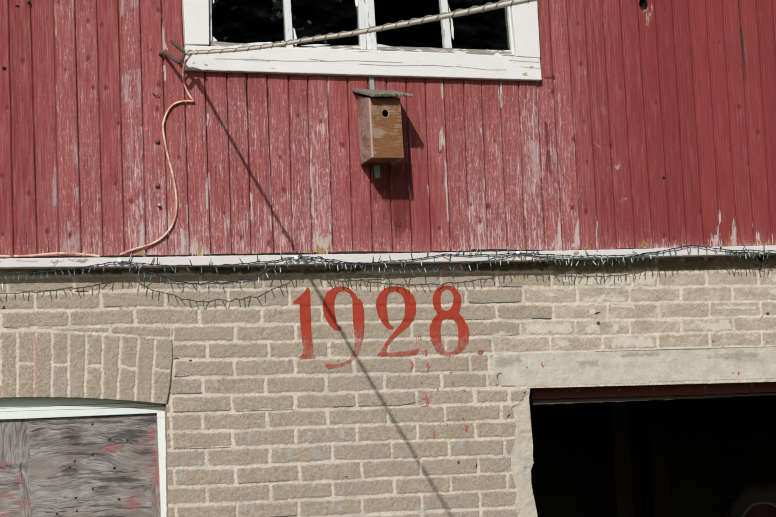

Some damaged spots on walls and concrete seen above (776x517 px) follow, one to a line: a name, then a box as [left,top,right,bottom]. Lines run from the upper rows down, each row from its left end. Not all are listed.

peeling [122,69,142,105]
peeling [439,128,449,221]
peeling [528,137,540,179]
peeling [310,147,332,254]
peeling [549,213,581,251]
peeling [707,209,737,247]